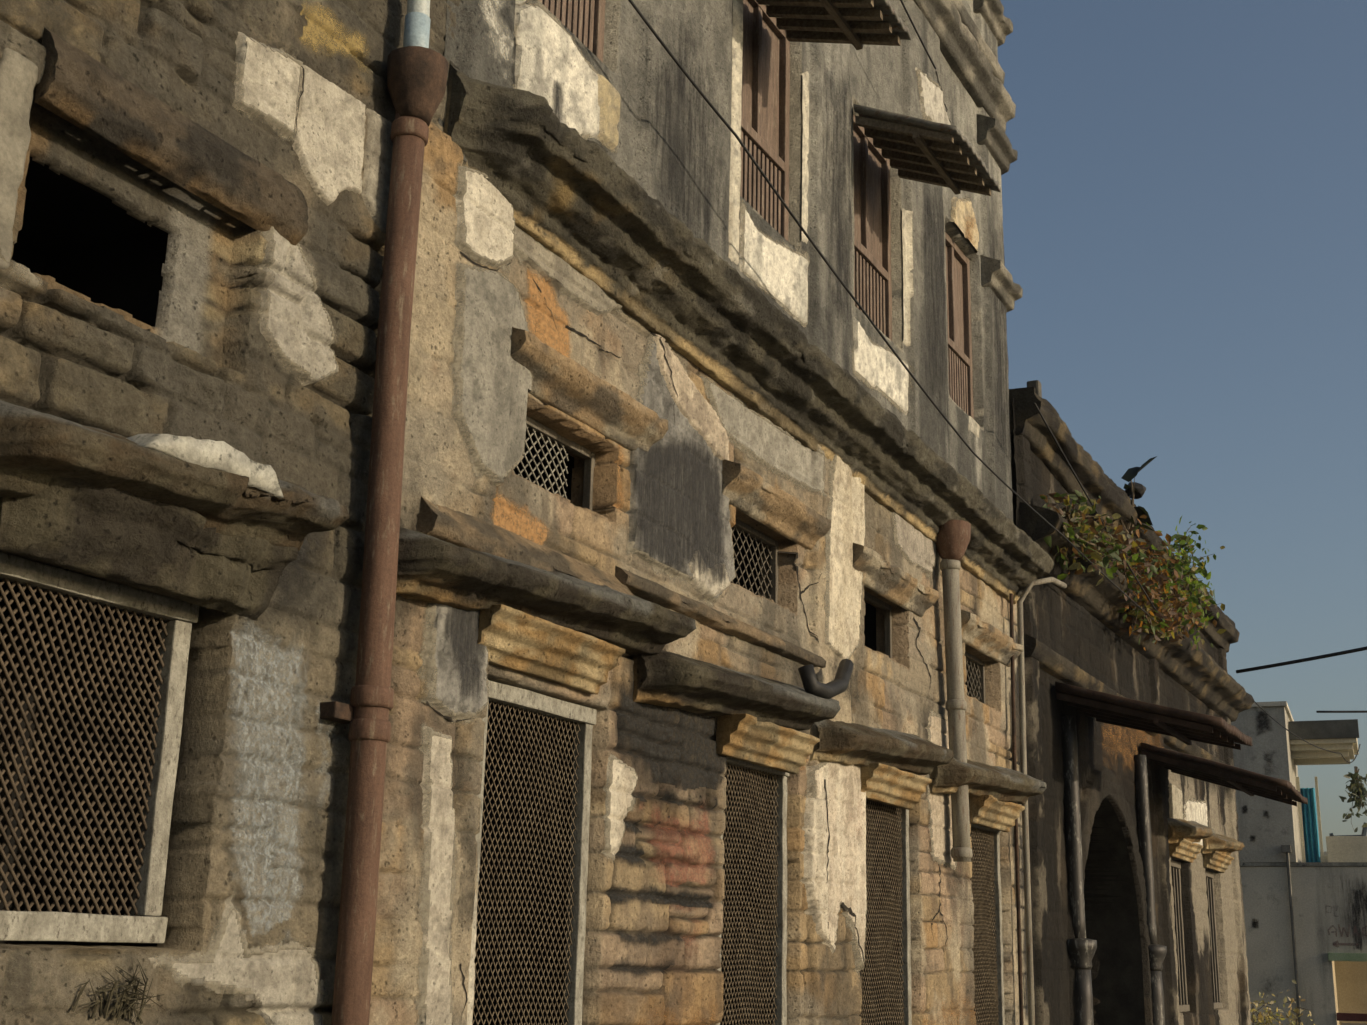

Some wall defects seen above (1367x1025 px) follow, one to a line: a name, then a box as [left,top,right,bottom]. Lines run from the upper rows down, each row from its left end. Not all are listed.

leakage [647,49,719,238]
leakage [825,77,852,313]
leakage [635,441,726,581]
peeling [799,762,867,974]
leakage [1342,883,1367,949]